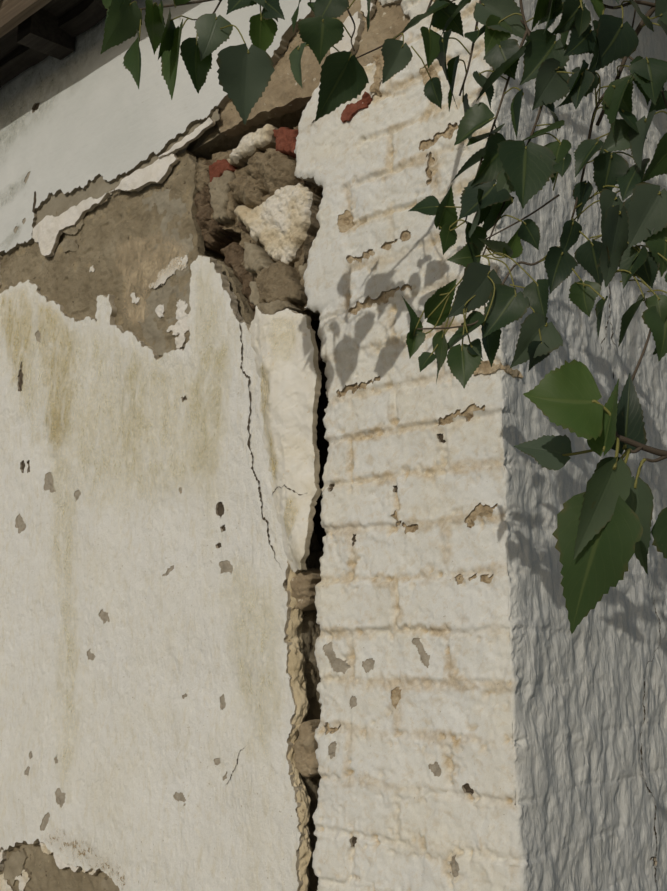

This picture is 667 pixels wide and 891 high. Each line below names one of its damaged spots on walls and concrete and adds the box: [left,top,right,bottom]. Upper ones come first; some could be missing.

flaking render [340,54,384,123]
spalling [338,210,355,233]
flaking render [0,118,215,358]
flaking render [44,472,56,493]
flaking render [15,514,26,533]
crack [236,305,322,891]
spalling [323,642,351,674]
spalling [363,658,375,673]
spalling [412,638,430,668]
crack [638,608,667,891]
spalling [429,762,441,776]
flaking render [0,843,120,891]